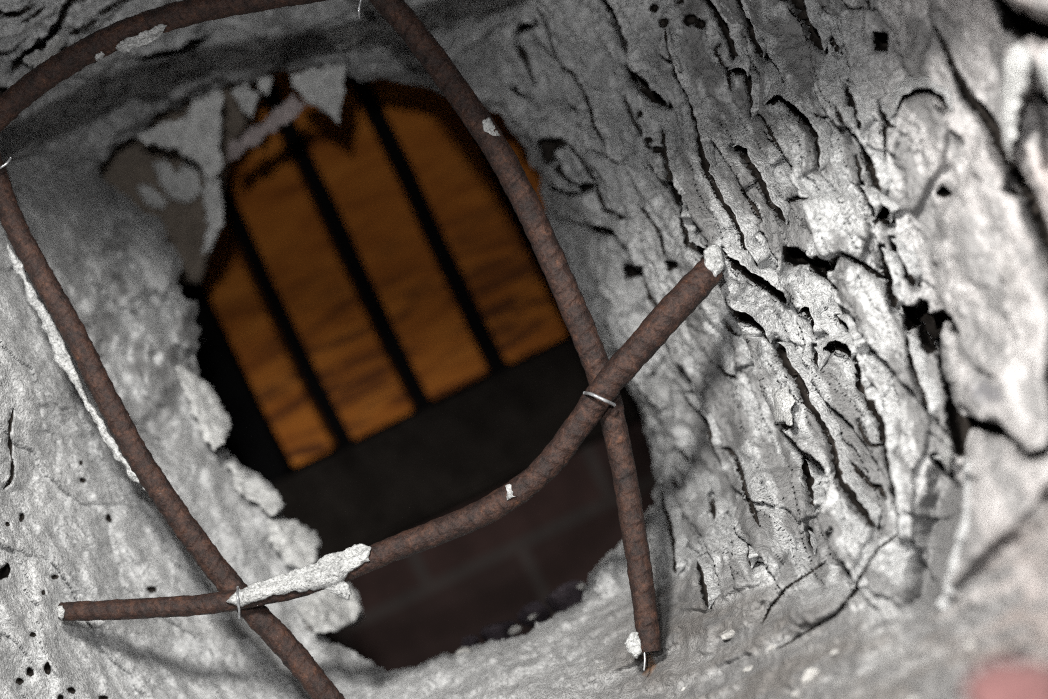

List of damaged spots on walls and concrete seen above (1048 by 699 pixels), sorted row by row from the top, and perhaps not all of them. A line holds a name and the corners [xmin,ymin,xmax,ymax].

spalling [0,0,725,699]
crack [510,3,605,143]
crack [548,0,1048,650]